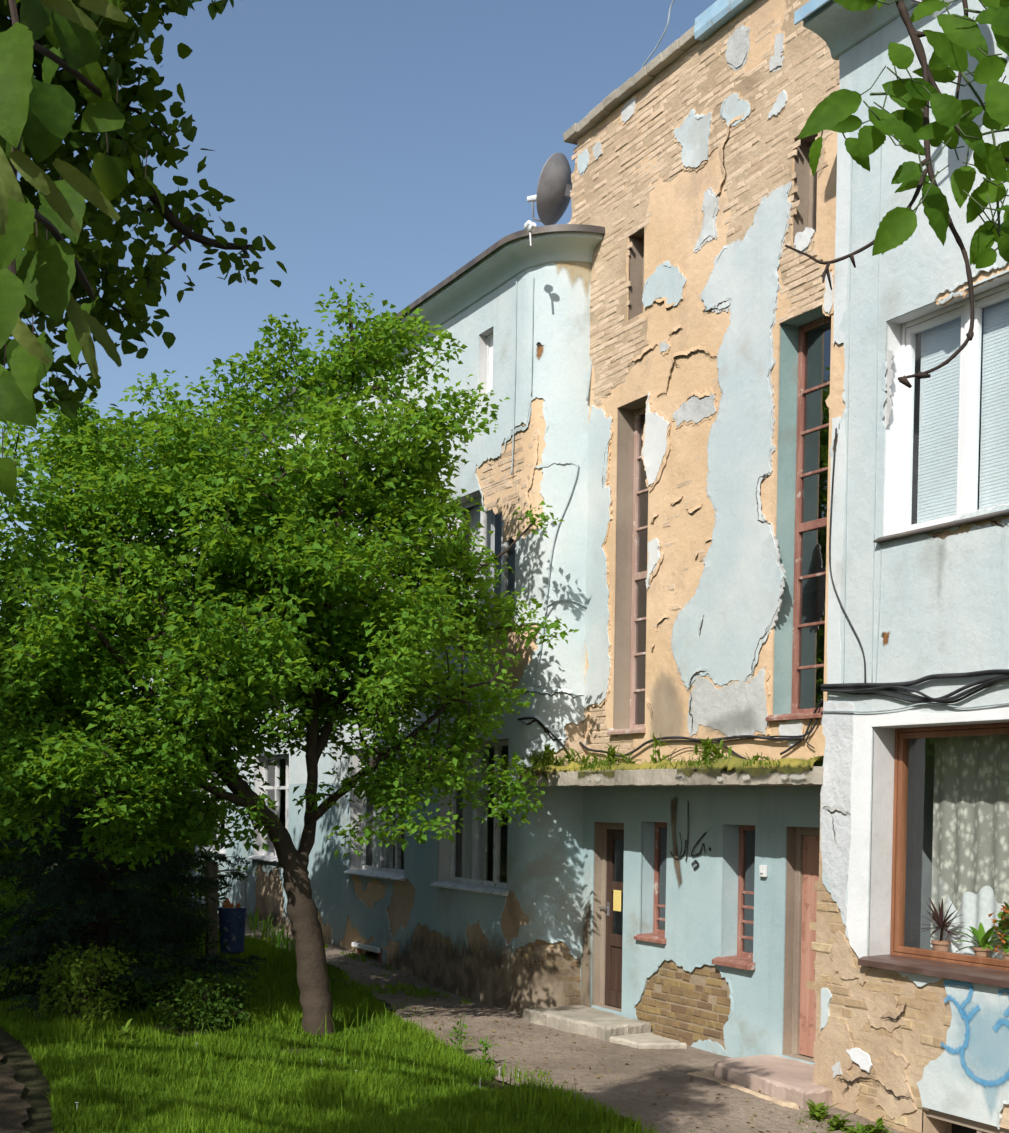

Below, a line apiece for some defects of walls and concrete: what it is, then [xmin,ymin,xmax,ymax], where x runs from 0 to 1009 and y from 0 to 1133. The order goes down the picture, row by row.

crack [715,108,756,197]
spalling [935,261,1009,306]
spalling [538,0,840,766]
spalling [825,341,847,458]
spalling [880,350,894,429]
spalling [475,398,549,544]
spalling [254,862,284,920]
spalling [318,869,453,964]
spalling [500,892,581,1006]
spalling [635,958,734,1050]
spalling [807,877,952,1133]
spalling [997,1100,1009,1129]